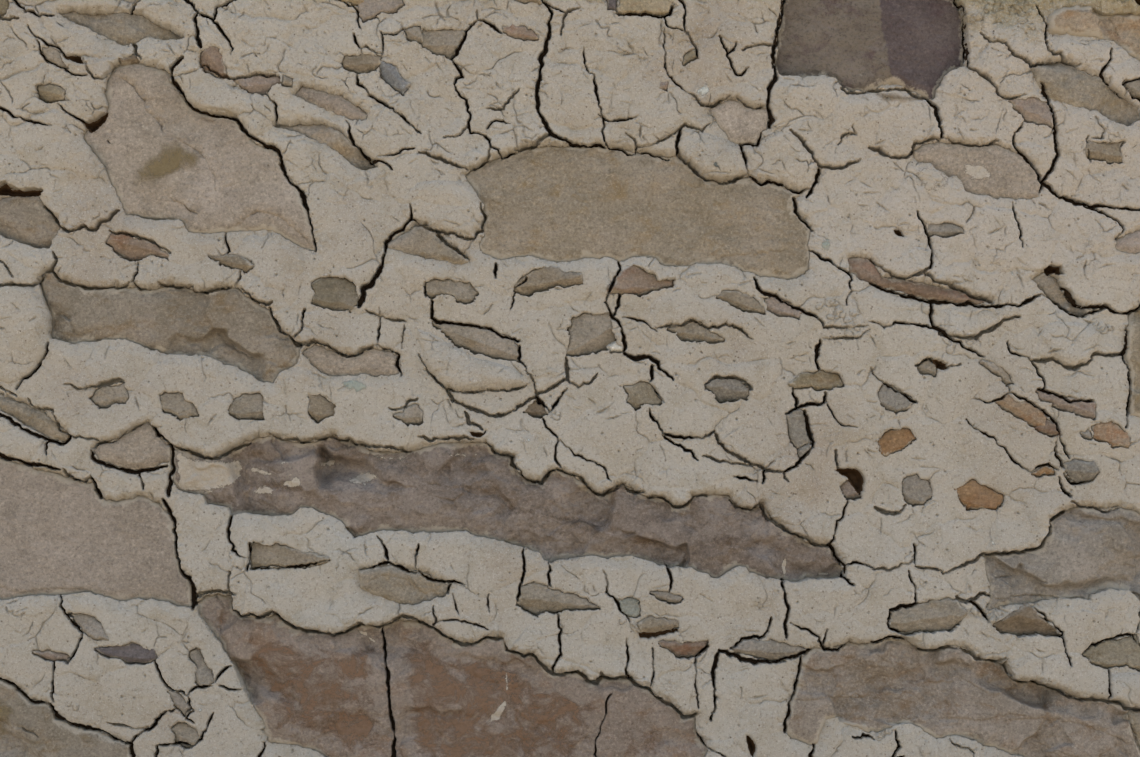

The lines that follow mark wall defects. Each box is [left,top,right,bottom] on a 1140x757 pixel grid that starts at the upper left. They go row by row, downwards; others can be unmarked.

crack [171,0,317,252]
crack [452,20,515,160]
crack [535,0,681,161]
crack [358,208,416,307]
crack [425,287,523,364]
crack [606,0,1140,496]
crack [0,413,197,608]
crack [0,596,237,757]
peeling [176,449,301,494]
crack [373,544,489,630]
peeling [487,673,508,723]
crack [695,544,916,757]